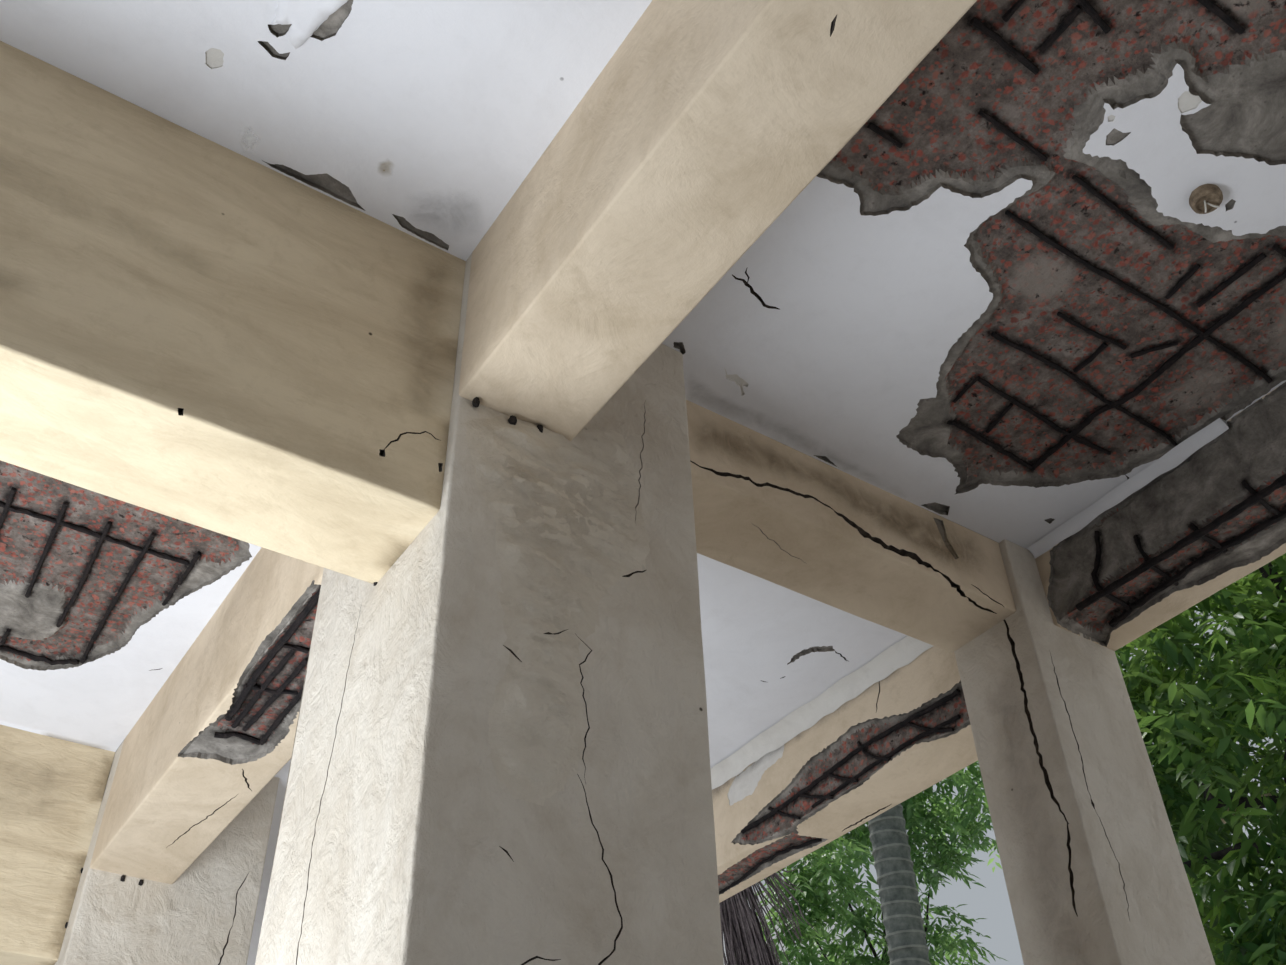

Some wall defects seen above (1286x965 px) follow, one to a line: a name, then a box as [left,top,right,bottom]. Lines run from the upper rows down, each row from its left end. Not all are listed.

spalling [817,0,1286,647]
spalling [0,460,252,671]
spalling [178,580,321,765]
crack [544,629,623,965]
spalling [718,680,971,895]
crack [690,460,1130,920]
crack [521,956,561,965]